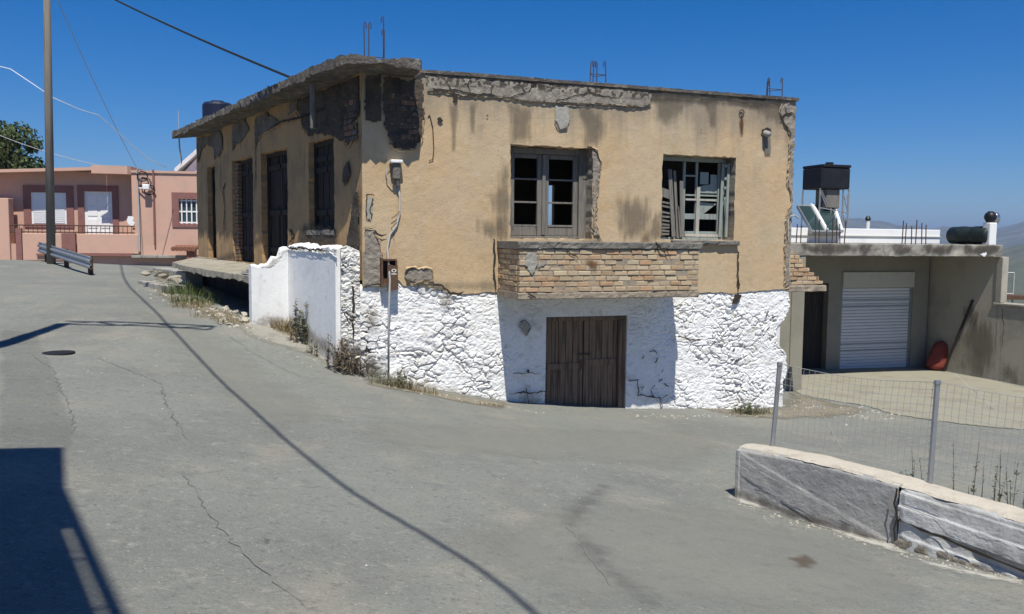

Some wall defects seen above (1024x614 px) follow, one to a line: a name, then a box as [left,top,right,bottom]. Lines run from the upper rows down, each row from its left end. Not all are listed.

peeling [197,76,359,163]
peeling [382,61,652,152]
peeling [261,160,383,285]
spalling [592,147,602,237]
peeling [766,77,823,286]
spalling [404,266,434,285]
crack [513,372,546,404]
crack [628,379,668,409]